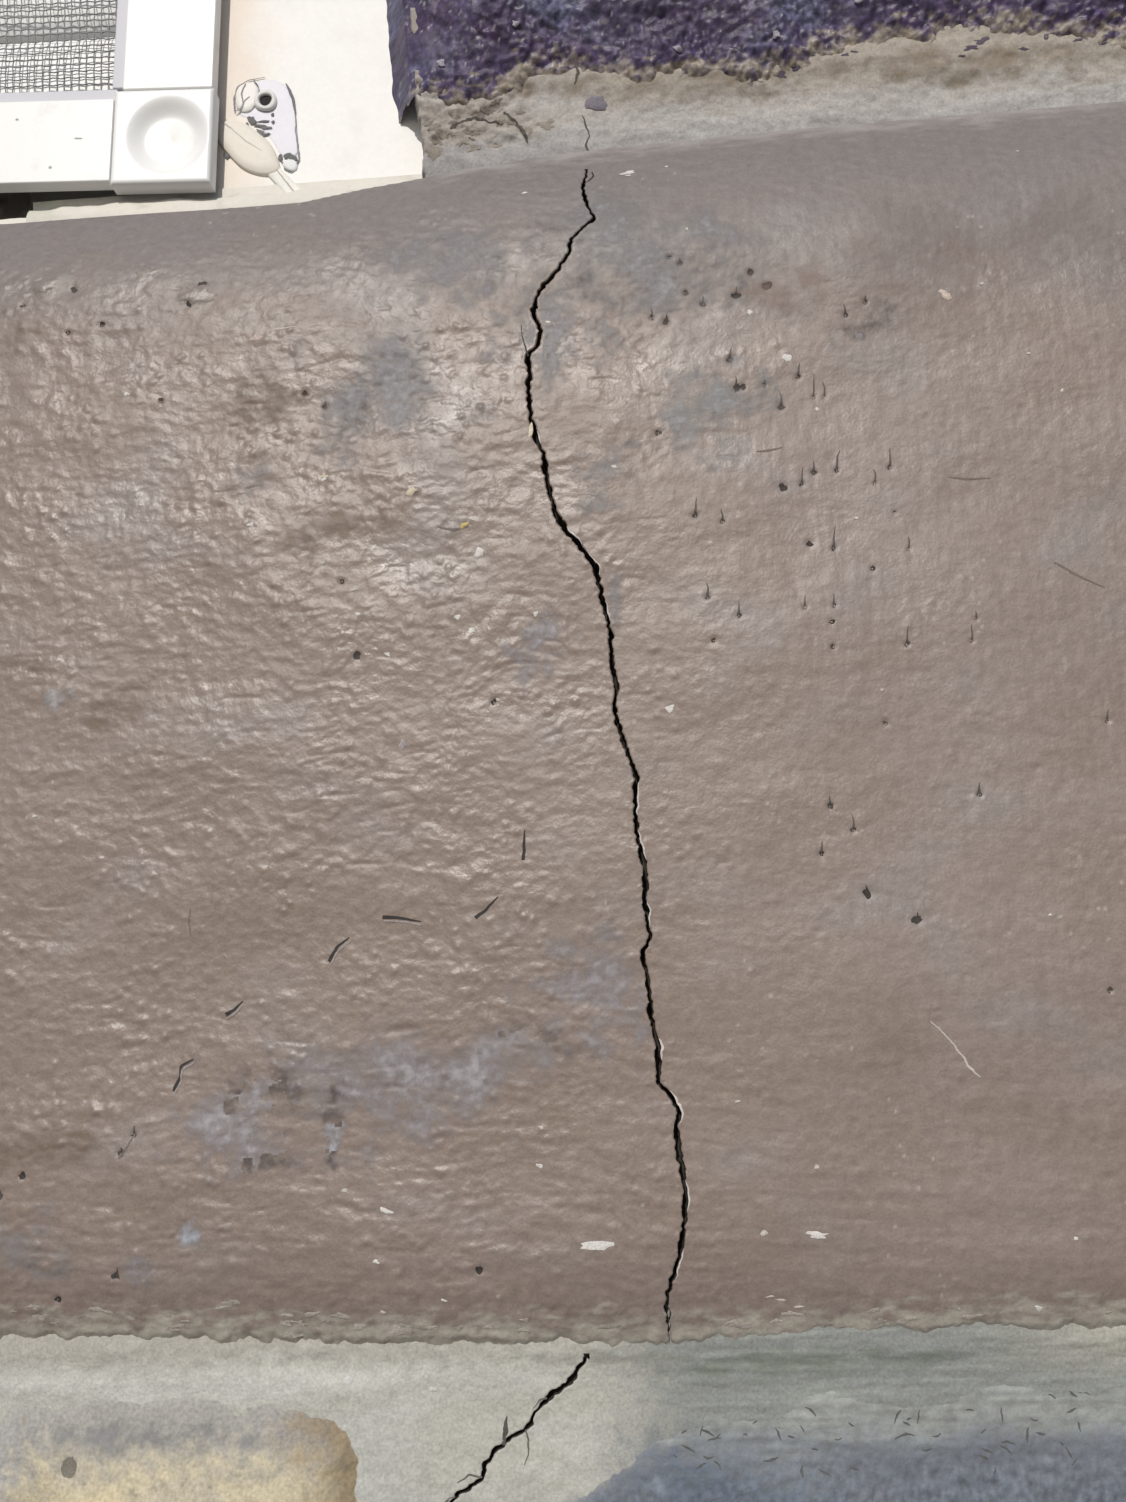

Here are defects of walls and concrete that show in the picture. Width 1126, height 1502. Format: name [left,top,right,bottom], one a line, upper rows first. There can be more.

crack [520,67,690,1335]
crack [445,1354,588,1502]